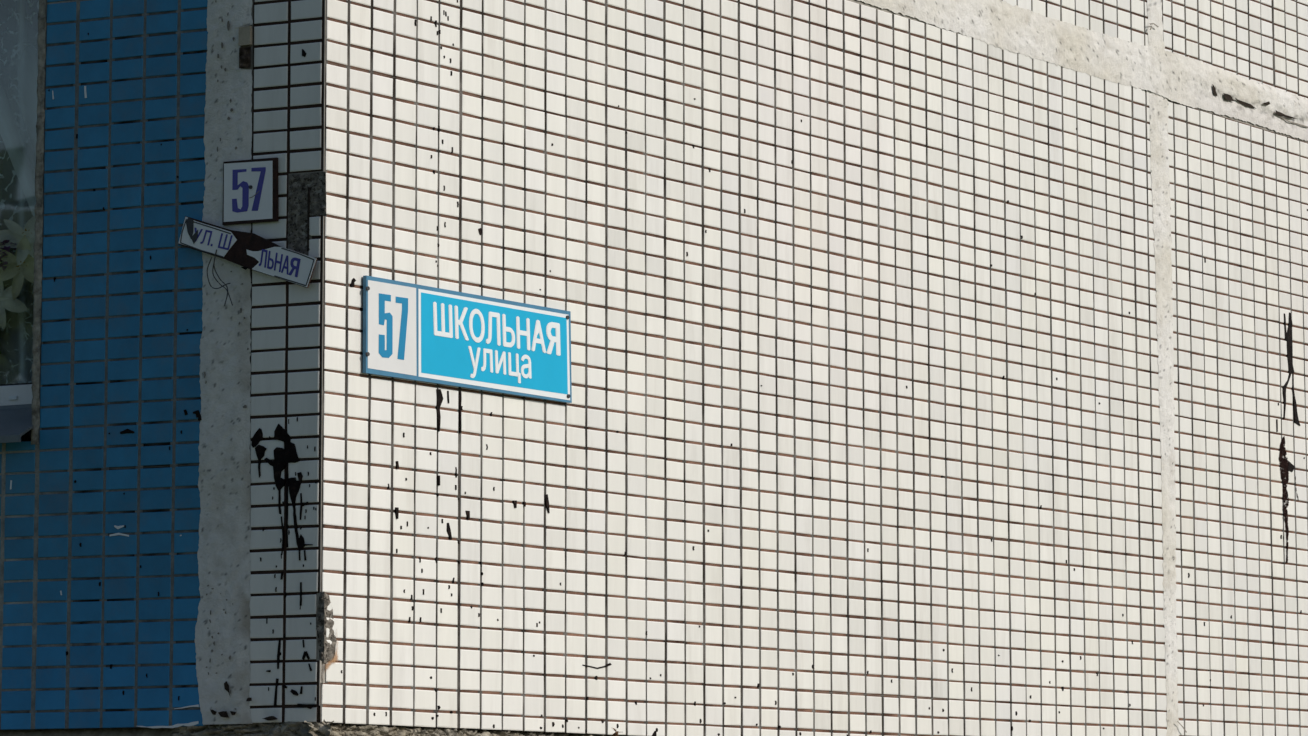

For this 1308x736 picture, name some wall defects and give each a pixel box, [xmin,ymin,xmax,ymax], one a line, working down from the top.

peeling [288,172,326,256]
damp [1276,312,1301,563]